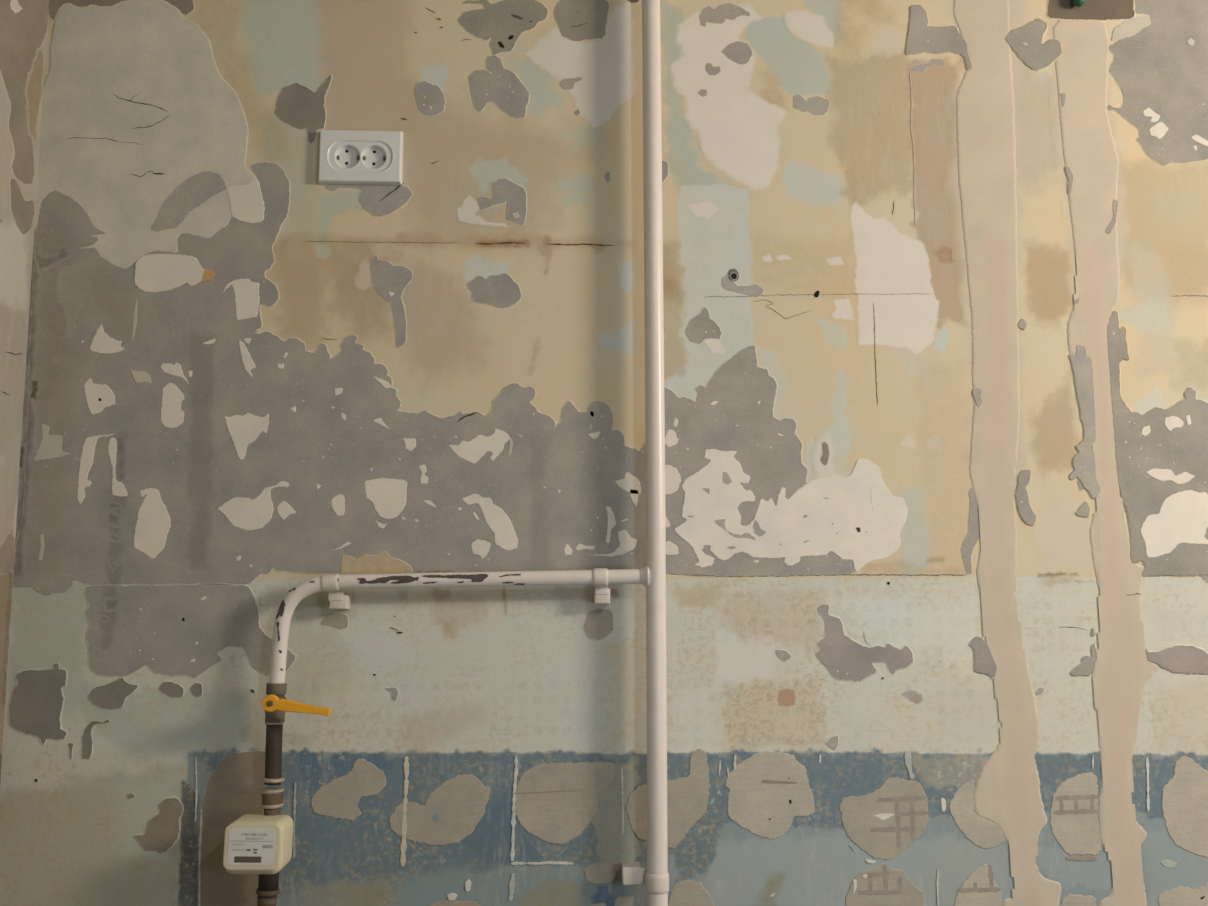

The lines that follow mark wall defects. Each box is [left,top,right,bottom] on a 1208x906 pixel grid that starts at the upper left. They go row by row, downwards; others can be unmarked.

peeling [699,2,751,27]
peeling [705,41,753,76]
peeling [1005,0,1208,167]
corrosion [274,225,640,277]
peeling [0,161,646,760]
peeling [664,345,855,578]
peeling [1107,310,1208,578]
peeling [133,796,184,854]
peeling [198,750,267,906]
peeling [447,879,471,901]